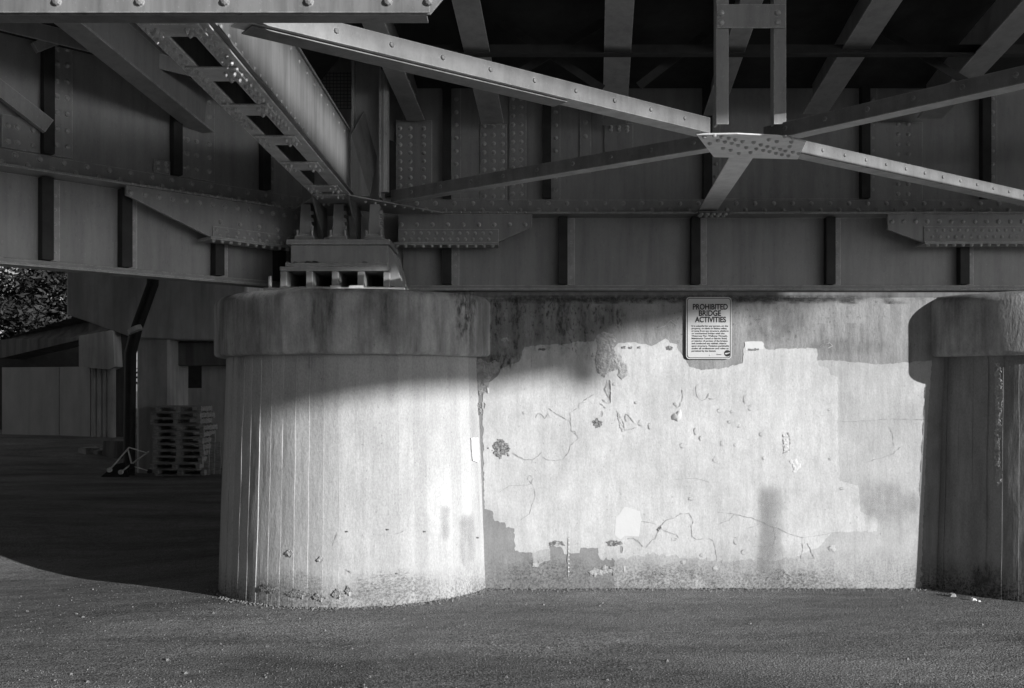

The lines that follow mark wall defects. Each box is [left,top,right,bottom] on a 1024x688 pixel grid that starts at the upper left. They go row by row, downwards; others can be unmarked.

peeling [476,359,502,416]
peeling [592,332,641,432]
spalling [487,439,510,459]
crack [500,383,636,520]
spalling [258,583,352,602]
peeling [588,565,628,577]
crack [628,512,842,579]